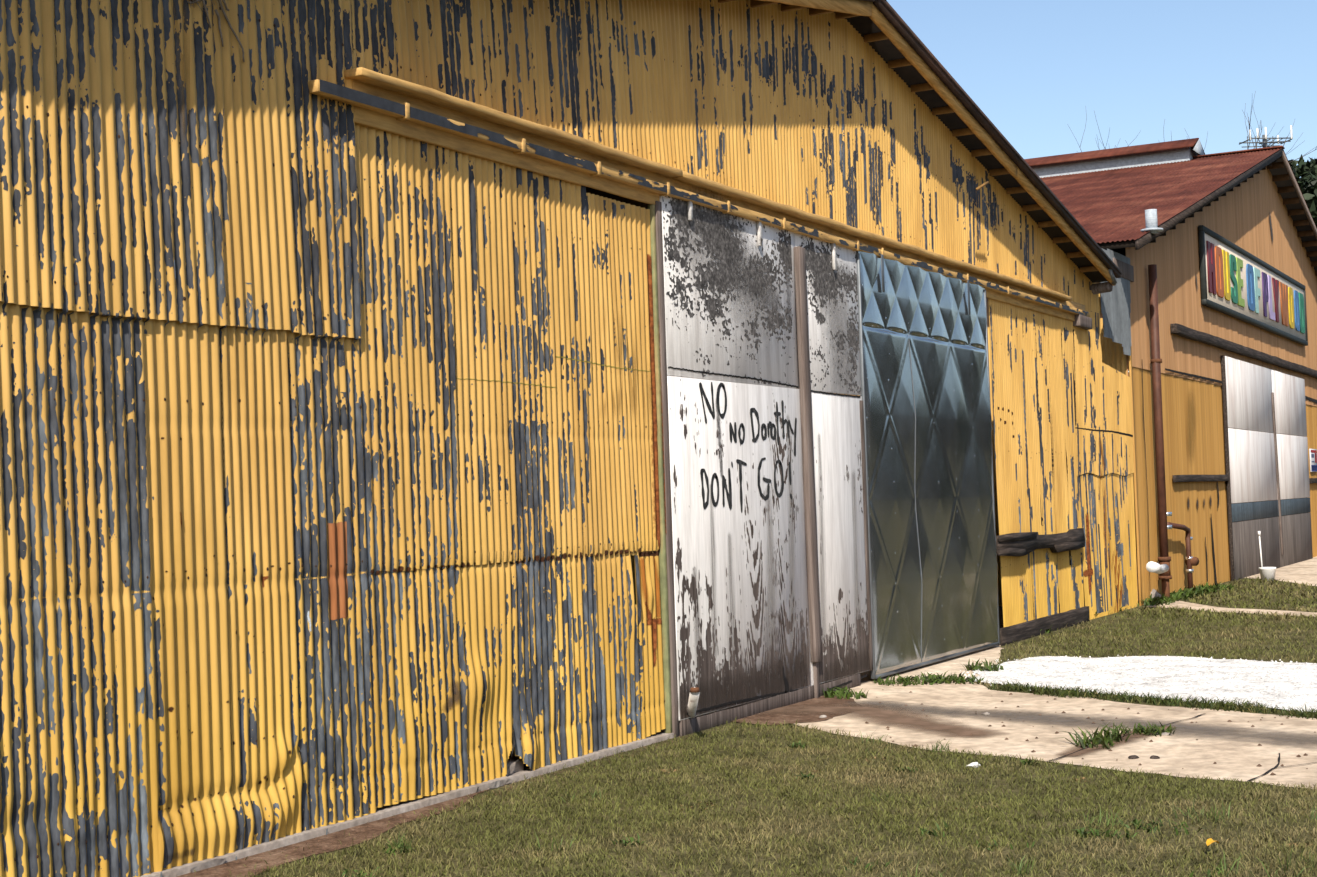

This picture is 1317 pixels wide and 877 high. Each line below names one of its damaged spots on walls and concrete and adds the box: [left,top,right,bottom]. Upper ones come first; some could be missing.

peeling [0,0,280,877]
peeling [231,0,738,831]
leakage [711,502,733,626]
leakage [680,659,805,710]
leakage [663,196,861,394]
peeling [670,379,870,719]
peeling [687,0,1131,622]